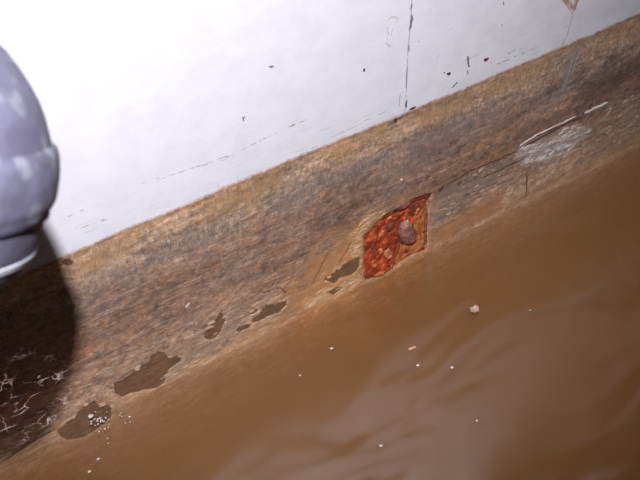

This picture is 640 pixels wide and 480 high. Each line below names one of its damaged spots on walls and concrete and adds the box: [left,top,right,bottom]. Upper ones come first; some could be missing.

crack [398,1,413,130]
crack [448,116,586,196]
spalling [316,186,444,296]
peeling [184,299,288,344]
rust [287,226,431,344]
peeling [112,353,200,396]
peeling [57,402,115,439]